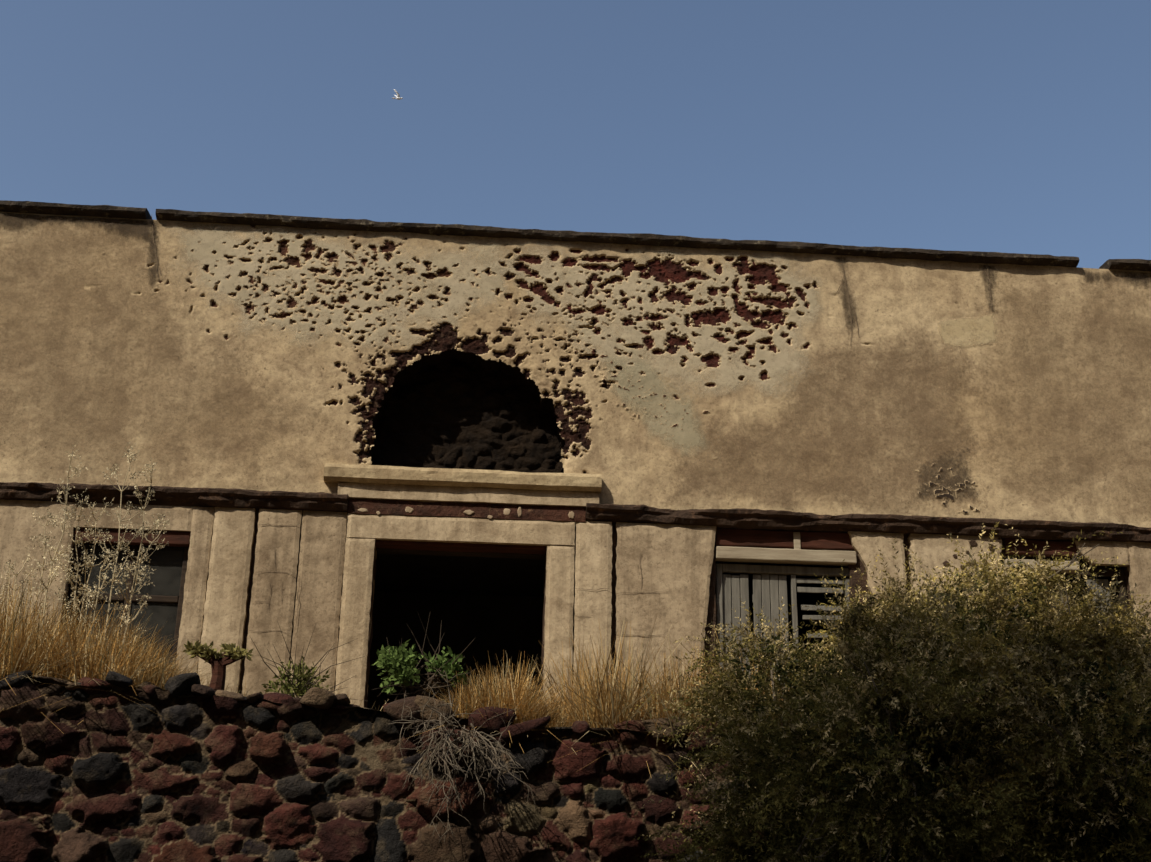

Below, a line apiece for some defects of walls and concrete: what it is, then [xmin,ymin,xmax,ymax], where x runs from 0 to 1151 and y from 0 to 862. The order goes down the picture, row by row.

damp [0,213,157,310]
peeling [175,226,820,474]
damp [841,284,855,328]
damp [981,265,996,307]
damp [683,346,979,513]